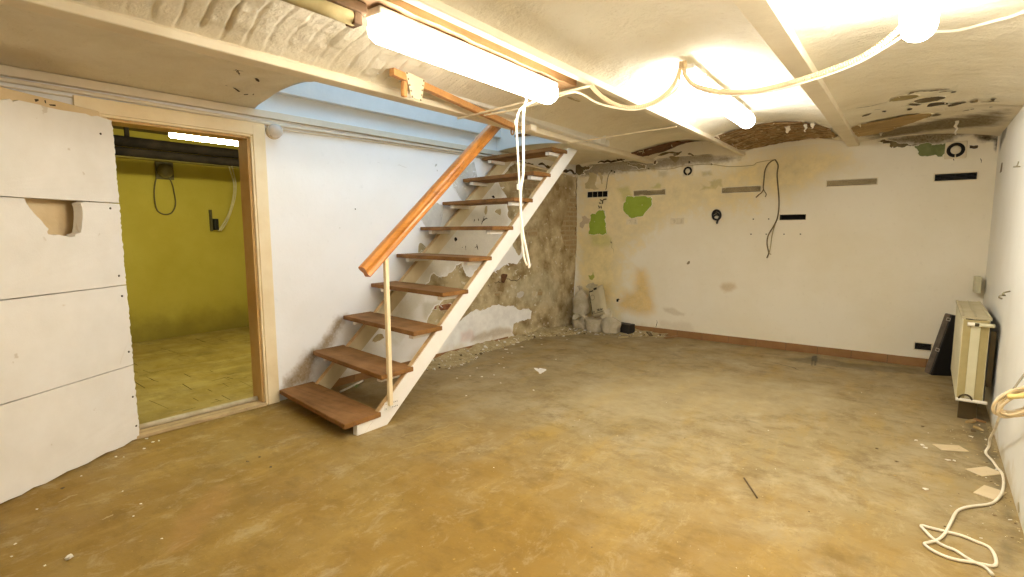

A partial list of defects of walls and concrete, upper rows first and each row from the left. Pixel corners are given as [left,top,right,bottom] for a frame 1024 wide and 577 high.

peeling [627,141,694,169]
peeling [421,202,444,227]
water stain [390,182,511,323]
flaking render [425,161,677,371]
water stain [440,105,1023,353]
water stain [278,306,354,400]
water stain [364,328,418,361]